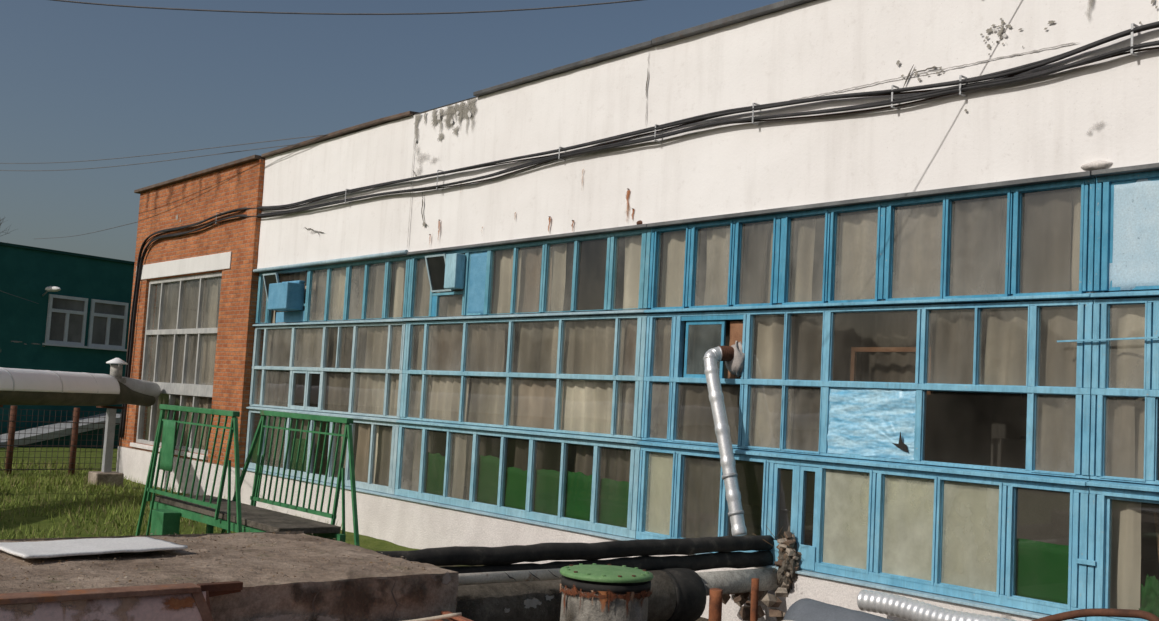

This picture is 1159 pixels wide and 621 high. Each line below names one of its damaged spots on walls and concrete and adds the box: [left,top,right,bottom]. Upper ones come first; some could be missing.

peeling [980,18,1022,55]
peeling [414,98,476,172]